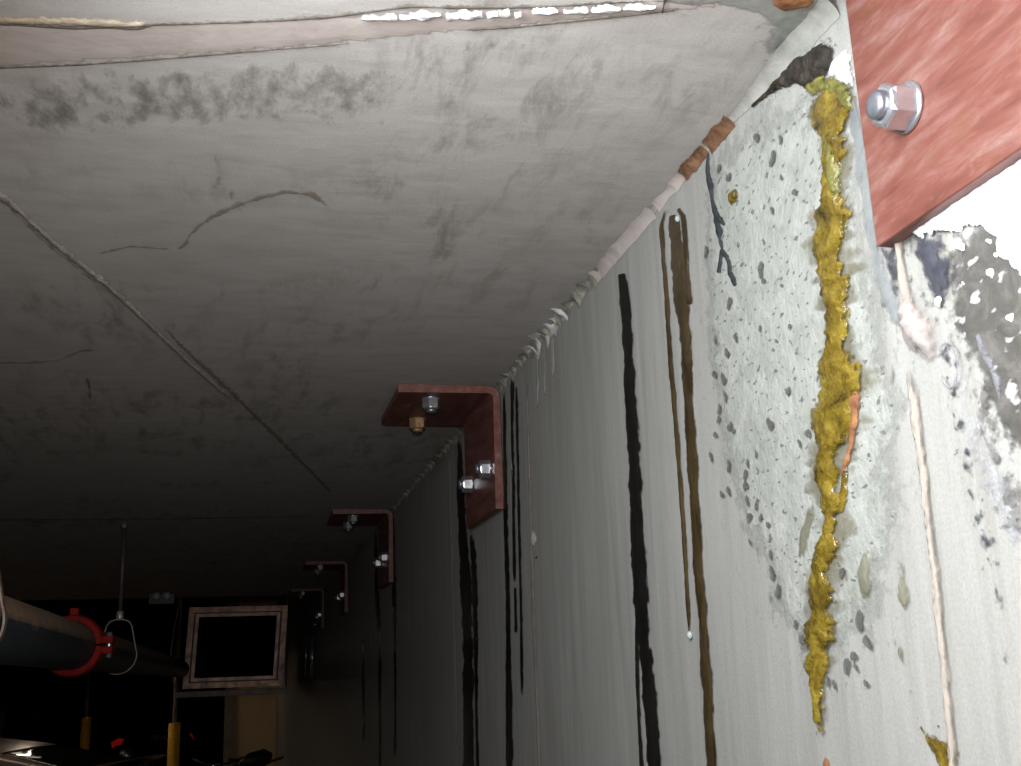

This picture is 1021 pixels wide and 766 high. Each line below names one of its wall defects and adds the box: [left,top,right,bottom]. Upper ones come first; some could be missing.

crack [0,43,348,69]
crack [0,0,678,30]
spalling [751,38,852,107]
rust [651,116,735,213]
crack [705,154,736,286]
peeling [913,159,1021,278]
hole [712,371,735,437]
damp [618,273,661,766]
hole [743,451,770,528]
damp [448,443,479,766]
damp [503,382,537,766]
spalling [769,550,780,598]